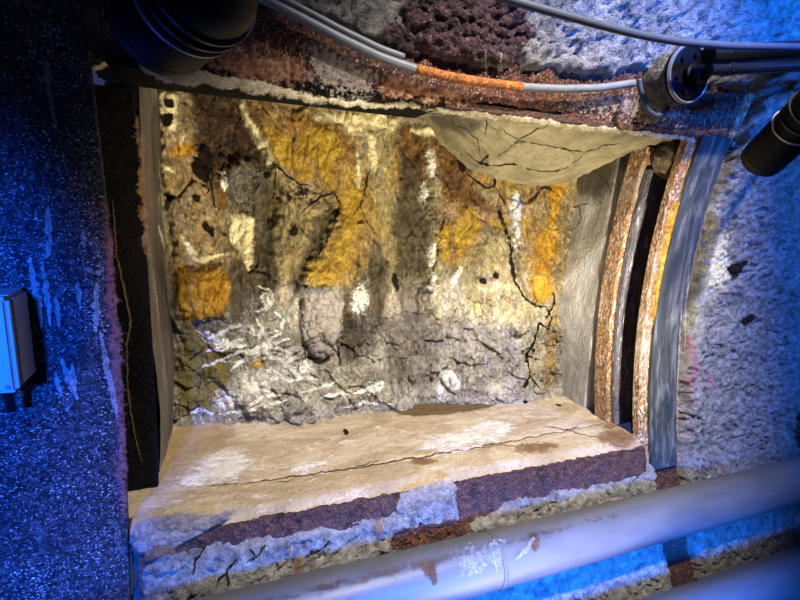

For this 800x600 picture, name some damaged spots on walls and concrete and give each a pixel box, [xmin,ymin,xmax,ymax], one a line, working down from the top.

rust [210,40,306,86]
rust [378,72,473,106]
crack [206,149,216,212]
crack [268,158,373,255]
crack [454,119,620,388]
rust [650,202,680,320]
damp [159,190,496,487]
crack [202,422,607,486]
rust [597,422,636,447]
crack [193,547,206,575]
crack [217,544,266,585]